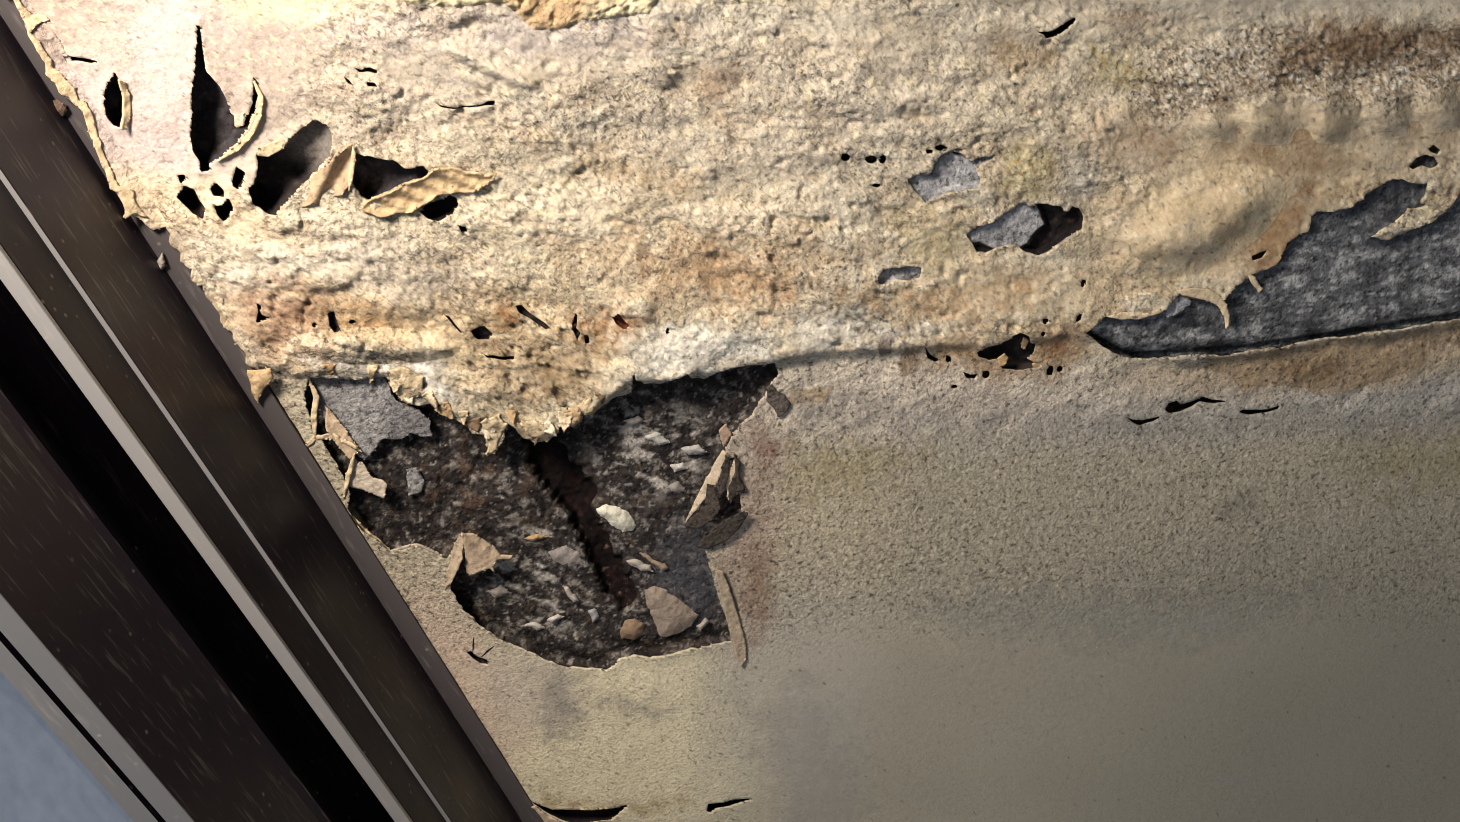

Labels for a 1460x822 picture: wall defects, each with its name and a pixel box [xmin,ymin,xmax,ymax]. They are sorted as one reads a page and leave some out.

peeling [218,80,288,162]
peeling [348,146,357,190]
spalling [907,145,995,203]
spalling [967,202,1083,255]
spalling [1076,145,1460,392]
peeling [878,319,1063,388]
spalling [304,363,832,670]